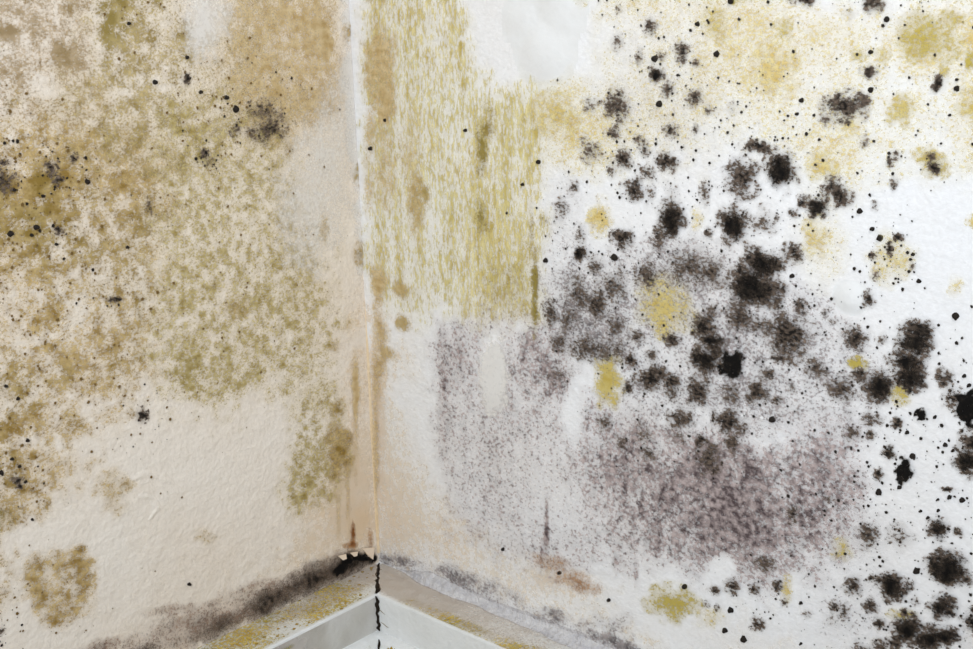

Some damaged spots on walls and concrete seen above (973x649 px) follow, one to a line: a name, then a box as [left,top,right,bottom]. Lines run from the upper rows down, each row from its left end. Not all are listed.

water stain [0,0,373,649]
peeling [339,547,375,560]
crack [374,563,388,649]
water stain [354,0,973,649]